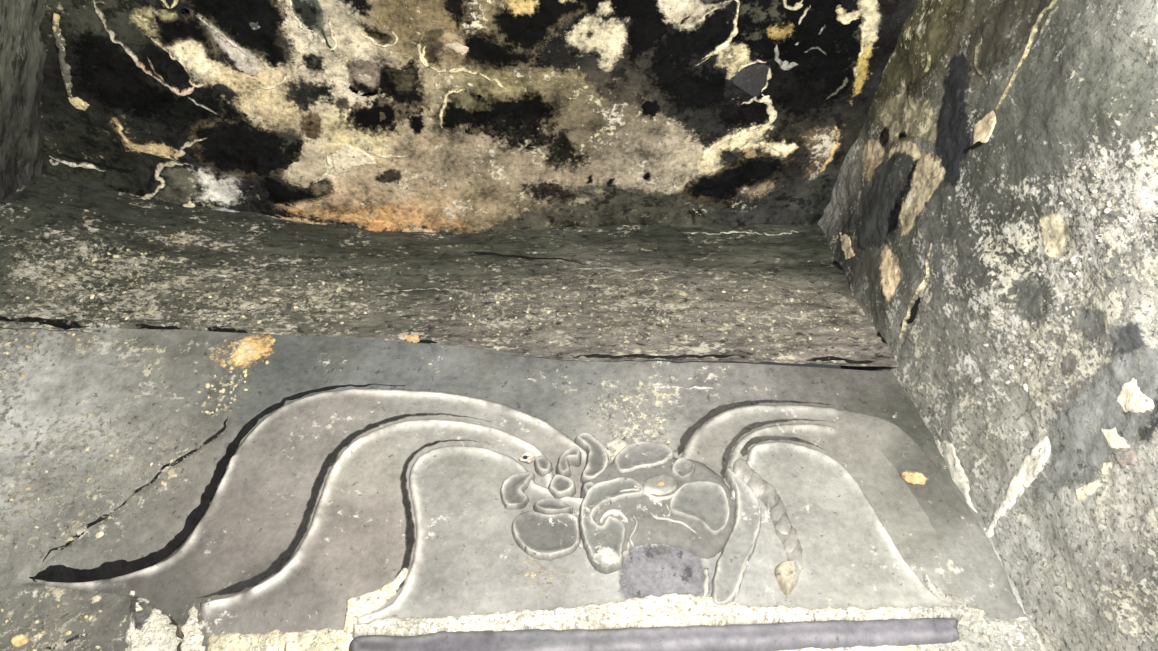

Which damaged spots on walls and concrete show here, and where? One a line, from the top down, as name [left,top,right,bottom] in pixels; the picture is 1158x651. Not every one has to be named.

damp [52,13,90,111]
damp [191,167,245,212]
crack [42,416,228,563]